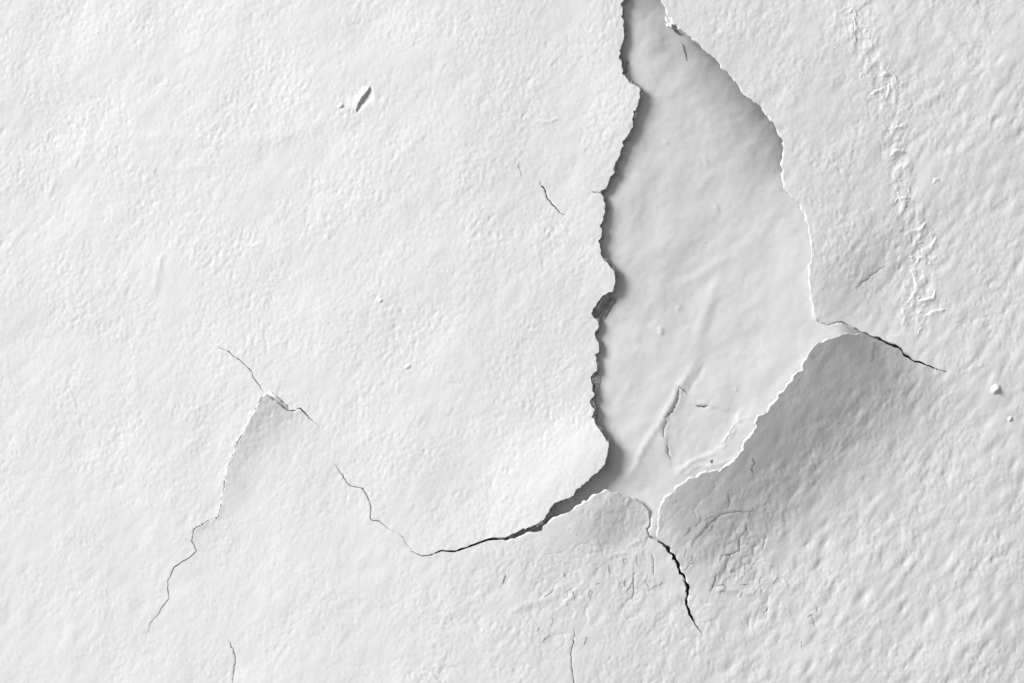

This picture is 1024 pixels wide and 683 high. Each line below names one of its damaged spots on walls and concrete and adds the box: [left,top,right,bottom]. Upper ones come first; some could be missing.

crack [221,348,262,391]
peeling [399,0,1024,683]
crack [870,338,948,372]
crack [336,466,506,556]
crack [537,492,778,683]